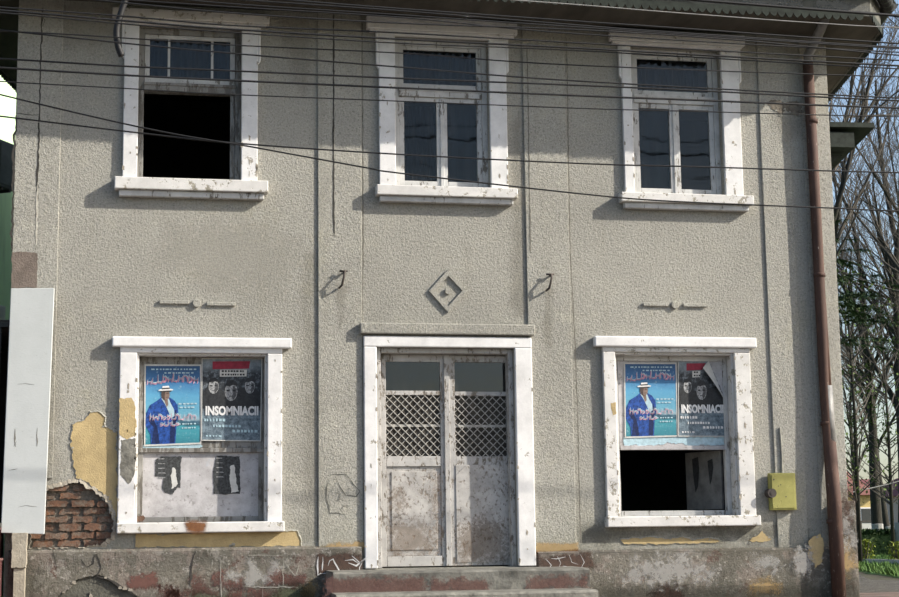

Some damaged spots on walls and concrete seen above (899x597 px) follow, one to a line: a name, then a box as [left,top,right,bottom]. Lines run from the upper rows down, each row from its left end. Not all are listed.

spalling [27,378,145,549]
rust [185,521,206,533]
peeling [134,529,302,548]
peeling [619,535,722,546]
peeling [748,531,771,543]
peeling [807,534,825,568]
spalling [60,575,137,597]